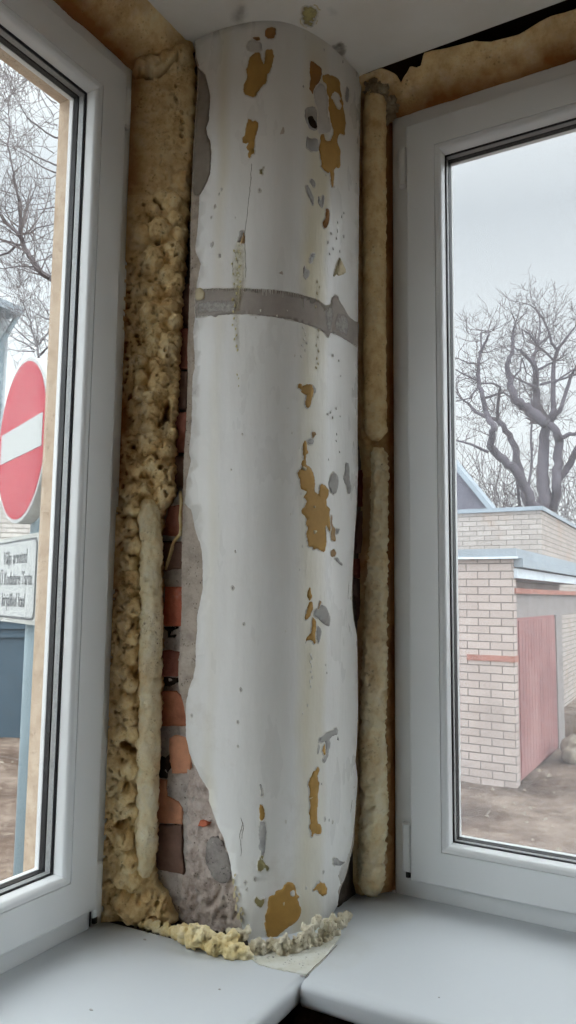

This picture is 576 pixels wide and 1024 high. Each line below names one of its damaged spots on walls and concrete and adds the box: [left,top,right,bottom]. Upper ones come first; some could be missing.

peeling [241,118,258,159]
peeling [243,27,277,98]
peeling [303,60,356,277]
flaking render [156,230,363,938]